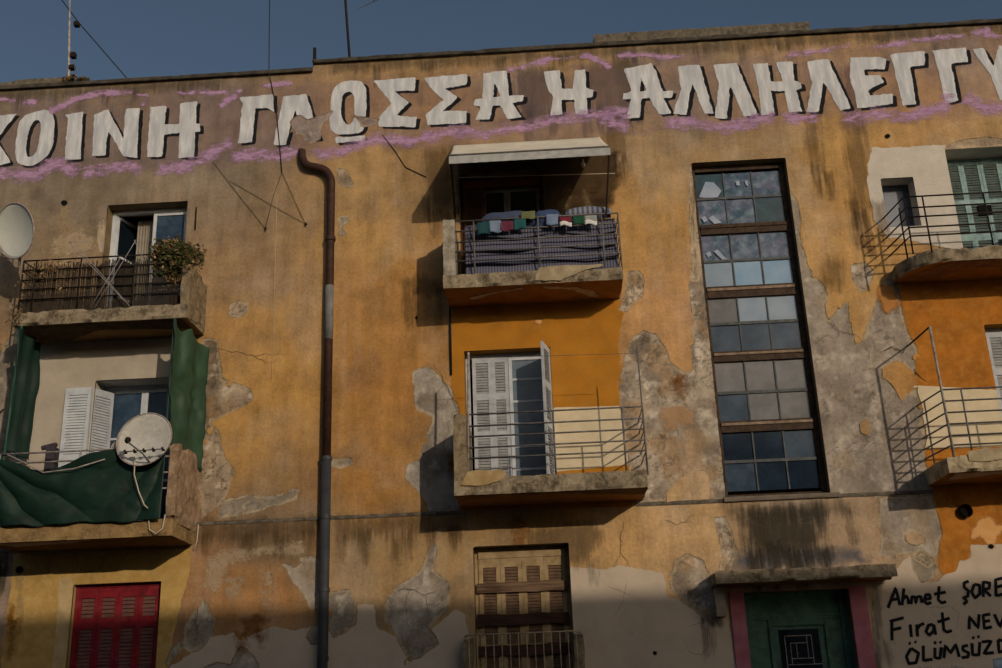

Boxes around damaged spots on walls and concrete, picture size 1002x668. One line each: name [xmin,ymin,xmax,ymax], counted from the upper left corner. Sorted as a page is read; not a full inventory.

flaking render [405,367,506,512]
flaking render [504,164,726,503]